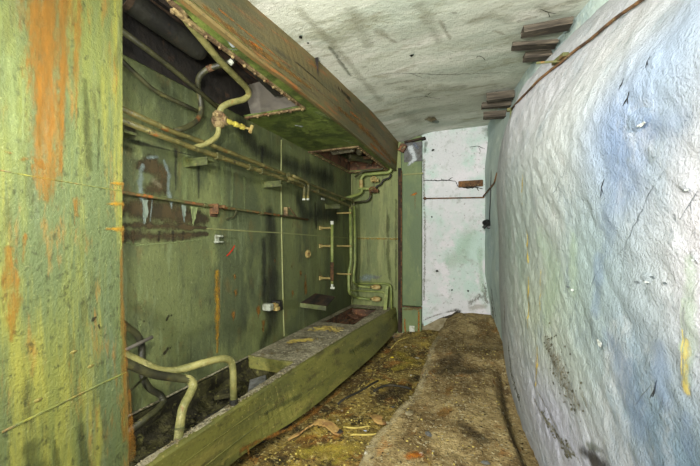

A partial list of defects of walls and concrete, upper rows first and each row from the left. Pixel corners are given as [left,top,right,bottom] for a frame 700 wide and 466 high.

damp [122,140,209,246]
mould [544,335,589,414]